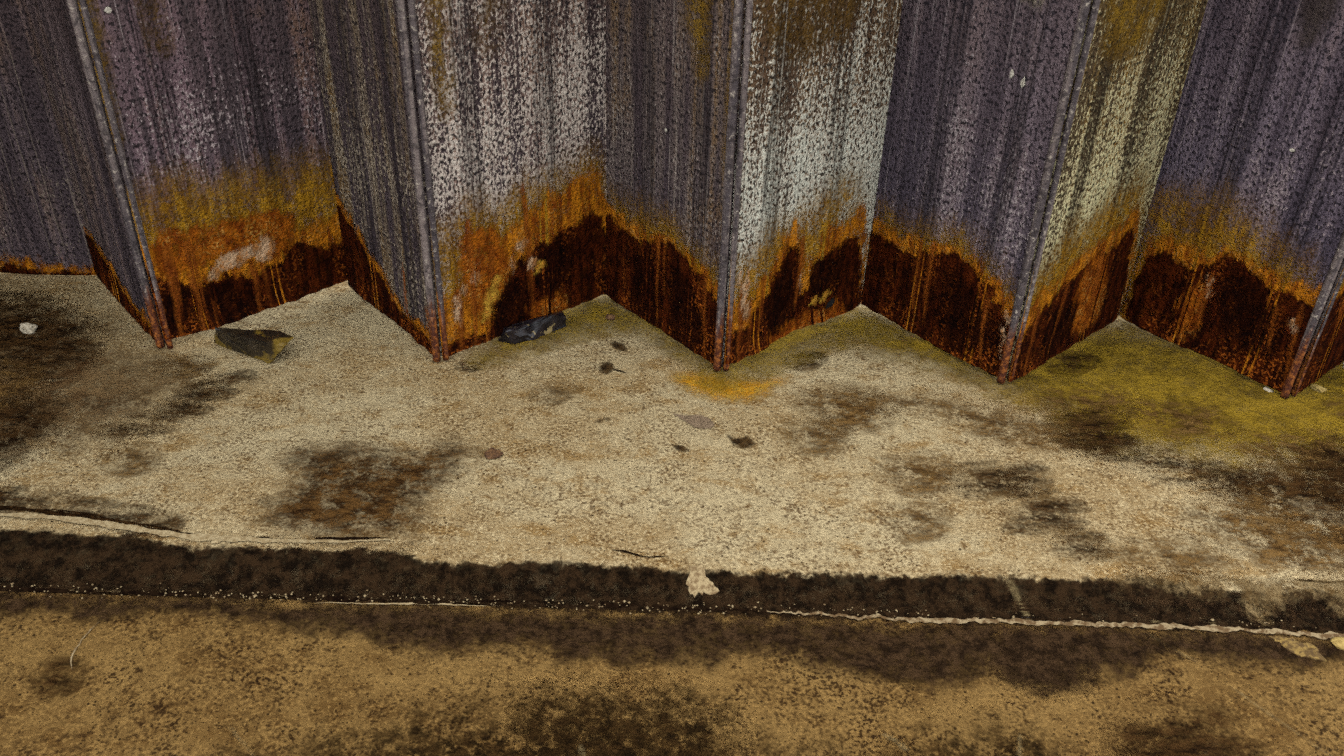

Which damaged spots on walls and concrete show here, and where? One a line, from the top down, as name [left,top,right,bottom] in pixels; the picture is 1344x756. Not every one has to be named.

rust [0,160,1344,395]
damp [0,486,184,536]
damp [0,294,253,476]
crack [0,505,391,543]
damp [262,441,466,537]
damp [460,299,1344,580]